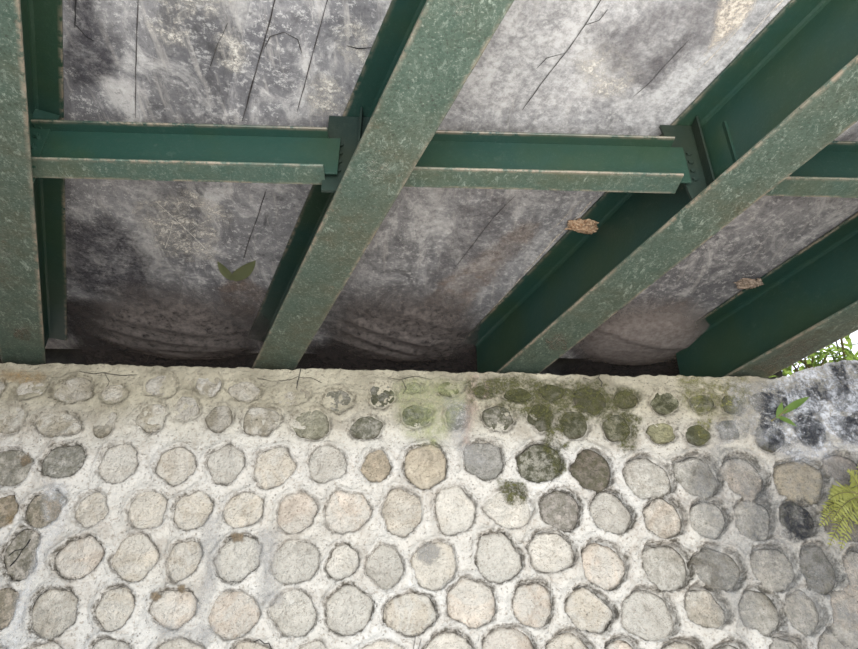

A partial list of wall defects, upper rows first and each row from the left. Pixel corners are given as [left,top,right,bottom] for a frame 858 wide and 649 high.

crack [74,0,94,41]
crack [132,5,140,118]
crack [242,0,328,121]
crack [523,0,608,109]
peeling [494,199,594,307]
leakage [543,422,568,452]
leakage [618,413,642,451]